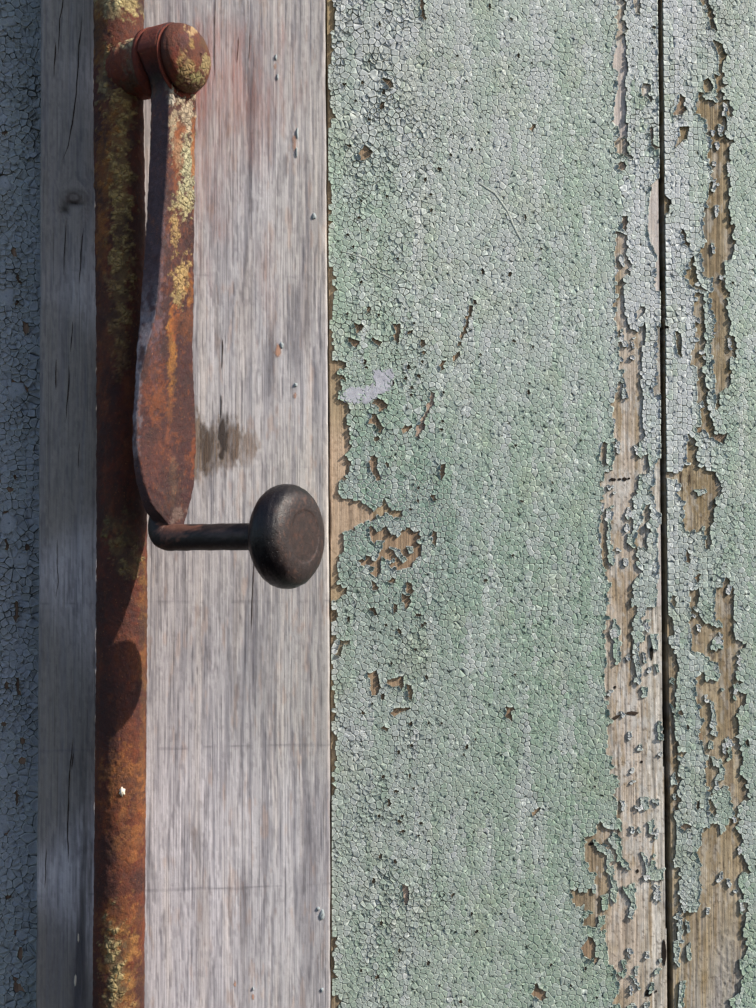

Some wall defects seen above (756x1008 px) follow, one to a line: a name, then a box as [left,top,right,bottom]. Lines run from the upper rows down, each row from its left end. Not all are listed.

peeling [327,0,336,70]
peeling [328,90,336,128]
peeling [380,74,393,110]
peeling [346,145,376,162]
peeling [438,300,476,370]
leakage [194,410,255,479]
peeling [329,267,437,627]
peeling [401,391,444,439]
peeling [570,0,750,1008]
peeling [331,635,350,795]
peeling [361,662,428,717]
crack [612,711,639,720]